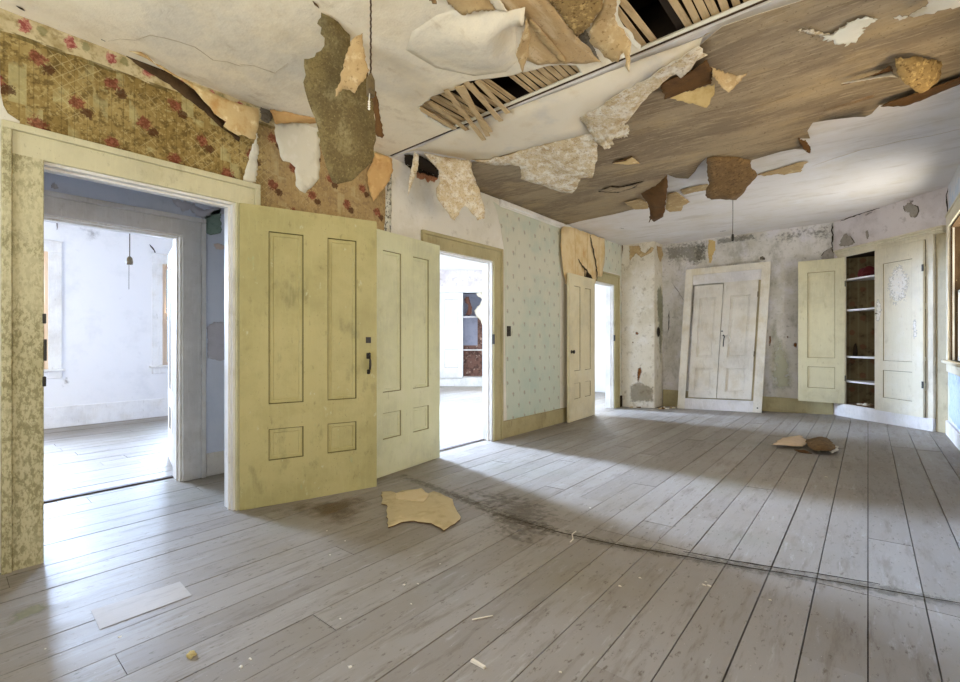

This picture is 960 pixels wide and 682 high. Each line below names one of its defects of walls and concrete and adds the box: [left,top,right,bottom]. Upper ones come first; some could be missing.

flaking render [615,0,760,50]
peeling [335,33,370,97]
peeling [841,66,898,85]
flaking render [130,51,320,193]
peeling [371,91,384,138]
flaking render [417,65,583,141]
peeling [601,124,630,149]
peeling [408,152,438,194]
flaking render [903,202,919,218]
peeling [560,226,605,284]
flaking render [629,246,663,262]